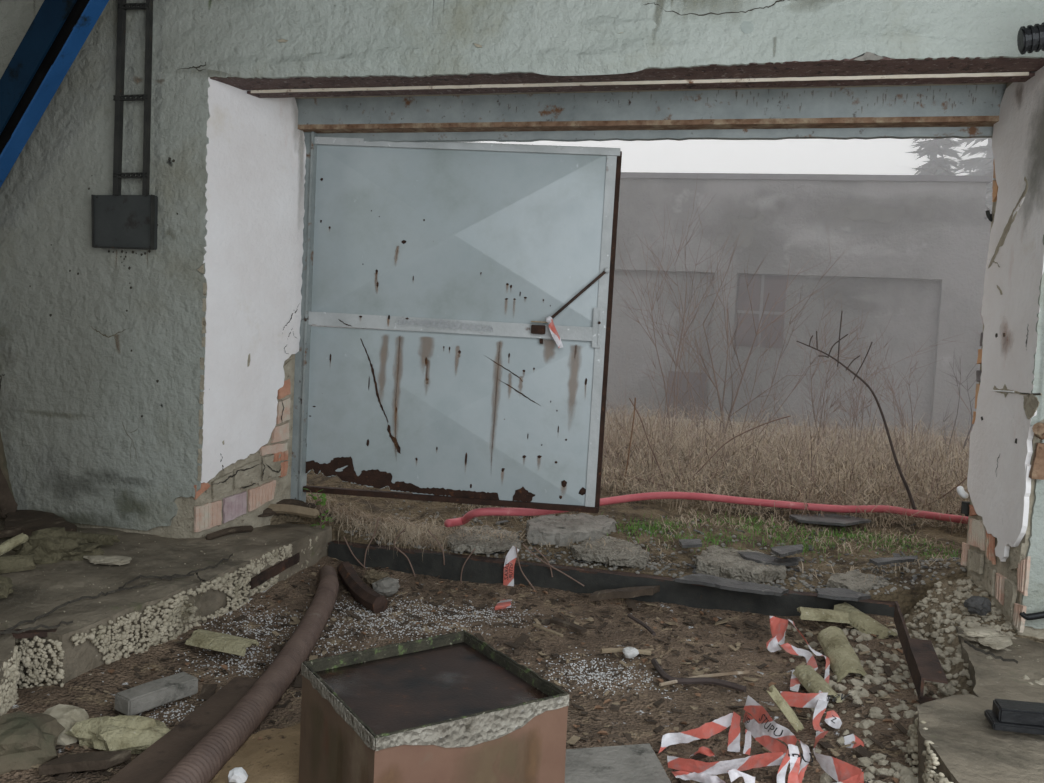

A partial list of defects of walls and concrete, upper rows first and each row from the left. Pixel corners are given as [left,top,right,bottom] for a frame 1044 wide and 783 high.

crack [645,0,785,16]
flaking render [194,263,292,532]
flaking render [972,333,1005,424]
crack [0,554,233,635]
flaking render [868,505,1031,650]